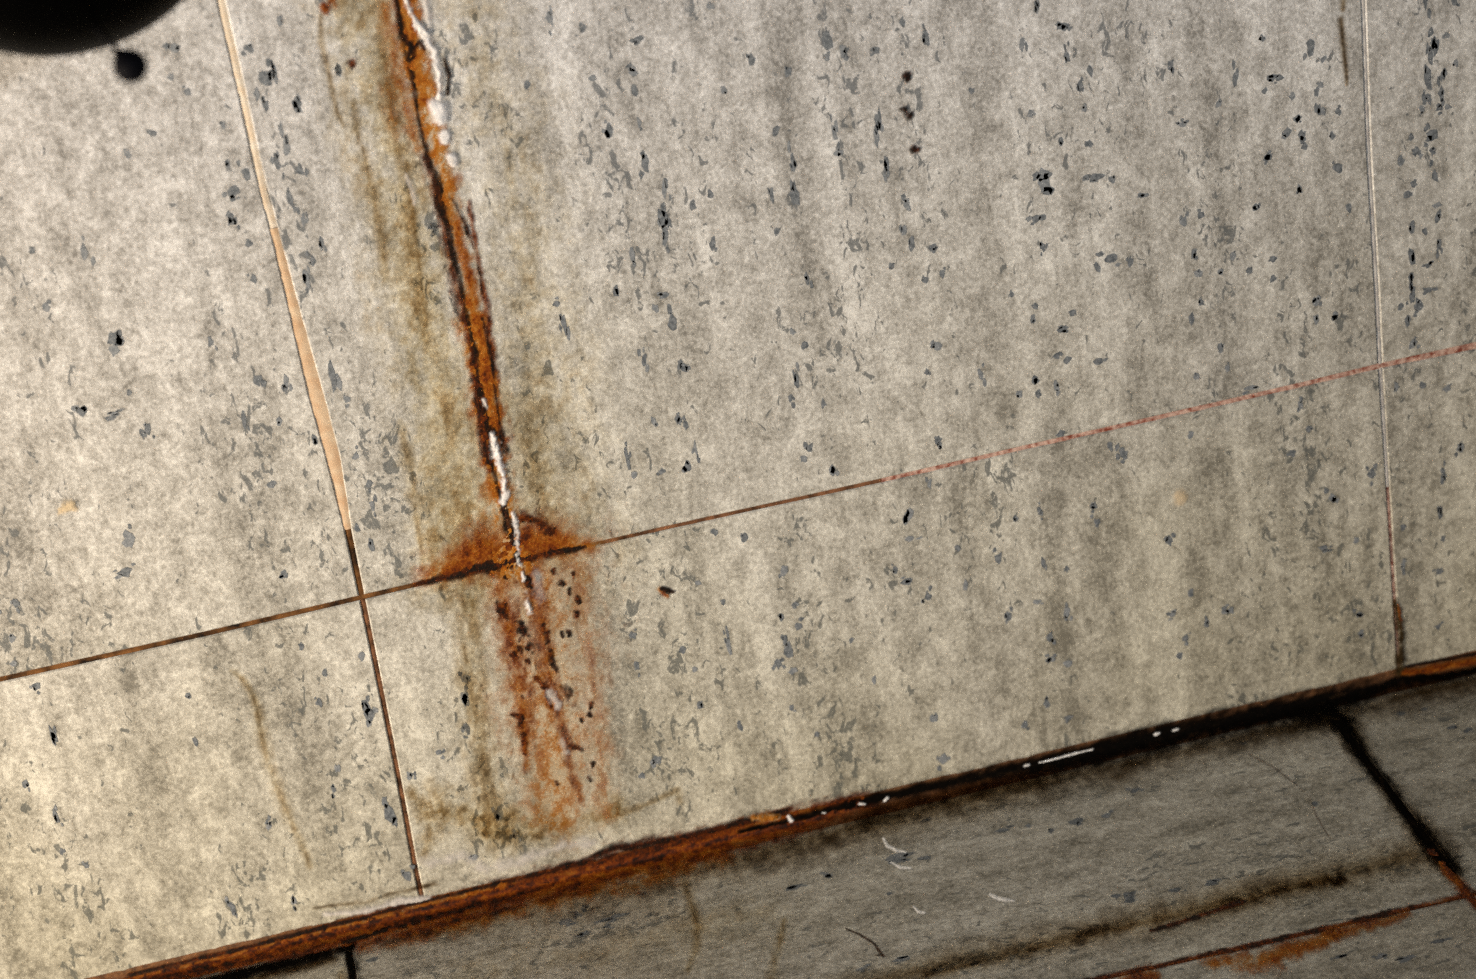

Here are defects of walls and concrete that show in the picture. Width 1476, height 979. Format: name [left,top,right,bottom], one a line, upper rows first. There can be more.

leakage [404,0,458,167]
crack [395,0,540,564]
rust [383,0,605,828]
rust [125,776,1042,979]
leakage [1074,920,1118,943]
leakage [1149,867,1371,932]
rust [1084,849,1476,979]